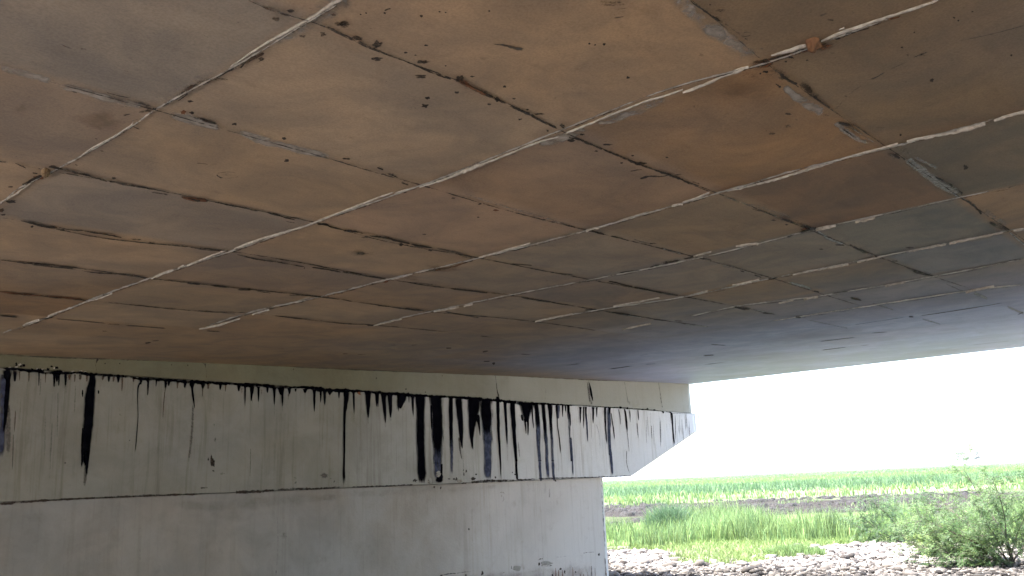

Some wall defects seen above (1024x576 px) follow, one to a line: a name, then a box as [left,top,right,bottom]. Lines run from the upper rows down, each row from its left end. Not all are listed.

leakage [0,362,700,483]